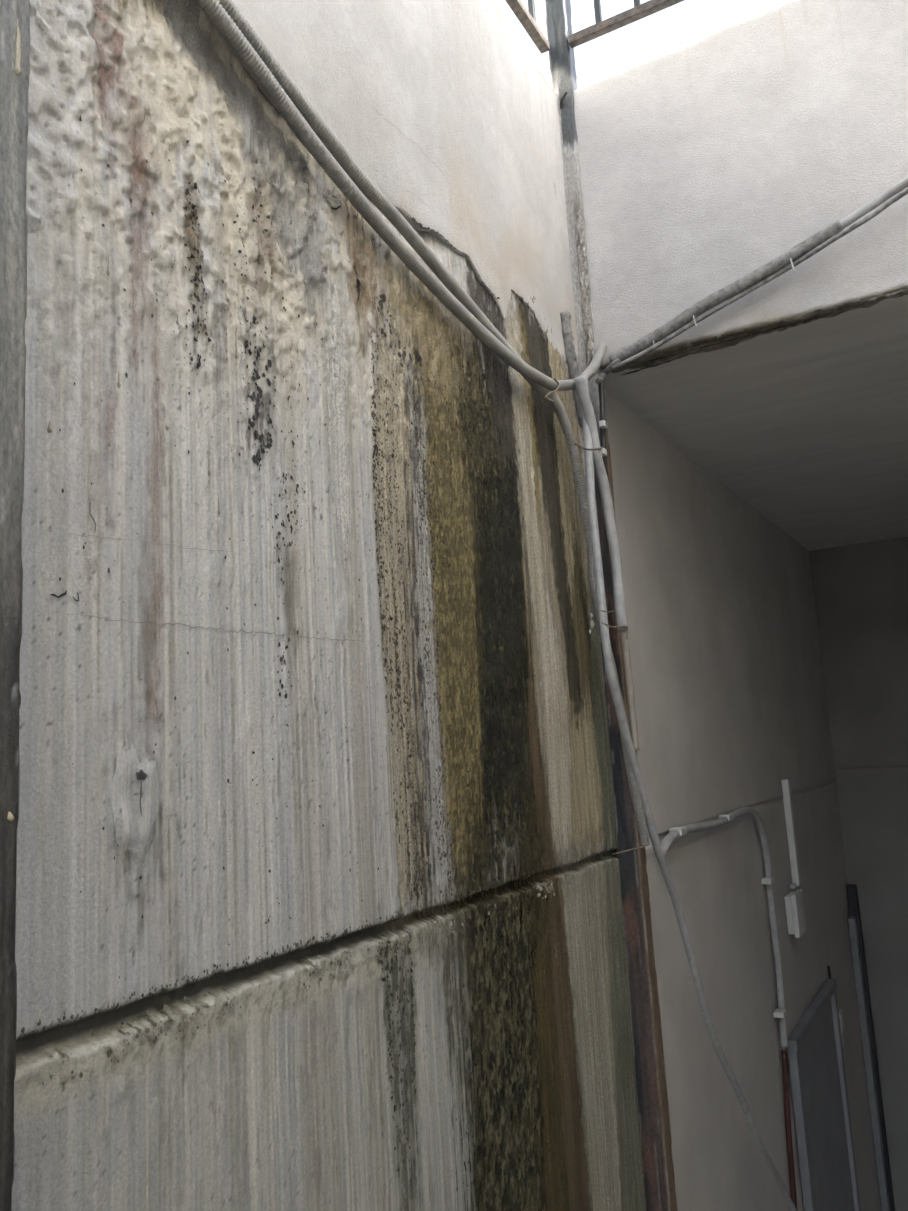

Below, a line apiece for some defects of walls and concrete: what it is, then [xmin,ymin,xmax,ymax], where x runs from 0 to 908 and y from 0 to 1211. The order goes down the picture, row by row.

damp [146,0,647,1211]
peeling [400,207,535,314]